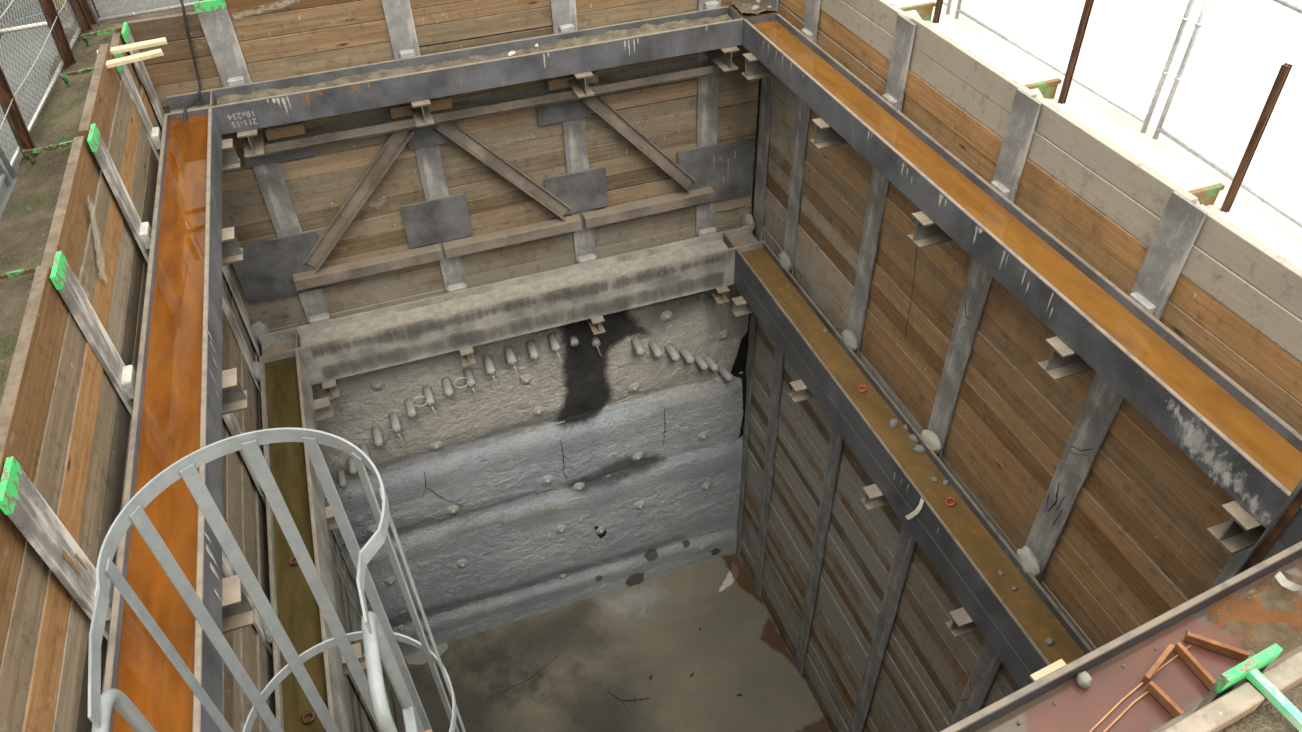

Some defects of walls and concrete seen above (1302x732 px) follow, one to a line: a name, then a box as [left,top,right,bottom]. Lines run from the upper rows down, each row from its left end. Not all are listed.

water stain [557,310,646,425]
water stain [569,455,664,492]
corrosion [1029,583,1302,732]